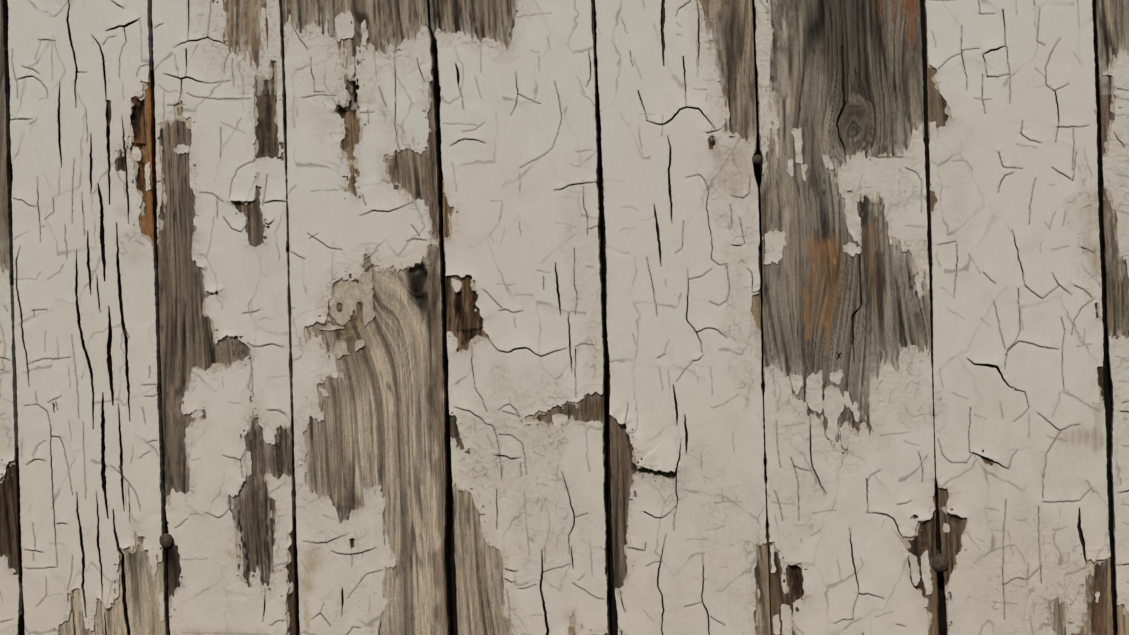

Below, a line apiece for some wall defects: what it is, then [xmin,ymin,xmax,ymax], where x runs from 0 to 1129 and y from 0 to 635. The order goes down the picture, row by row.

peeling [0,0,14,285]
peeling [0,447,23,583]
peeling [107,70,251,498]
crack [141,0,240,106]
peeling [208,0,518,205]
peeling [229,70,513,635]
crack [463,182,599,524]
crack [629,385,724,635]
crack [638,0,753,361]
peeling [684,0,949,454]
crack [919,408,1012,473]
crack [948,3,1092,570]